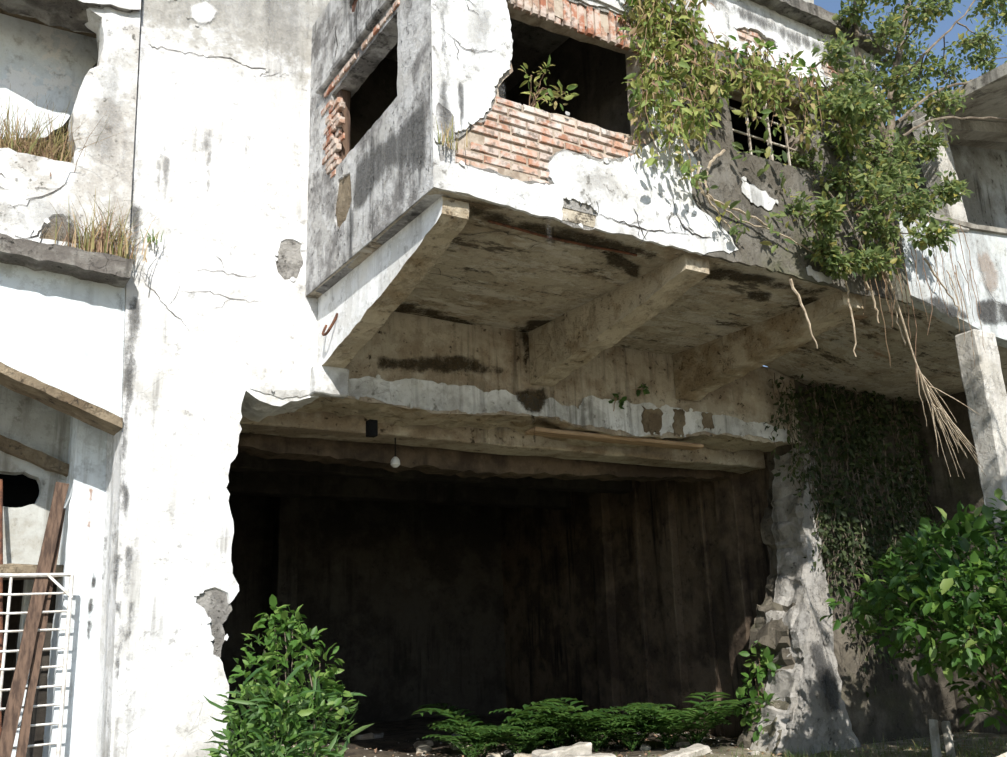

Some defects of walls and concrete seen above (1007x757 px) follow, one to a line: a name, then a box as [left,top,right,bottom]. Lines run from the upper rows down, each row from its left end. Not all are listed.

spalling [506,0,646,55]
spalling [321,0,400,231]
leakage [351,102,425,235]
spalling [455,96,646,184]
spalling [275,240,306,282]
leakage [924,296,1007,324]
peeling [251,386,310,399]
leakage [378,356,503,373]
peeling [348,374,787,442]
spalling [194,587,232,658]